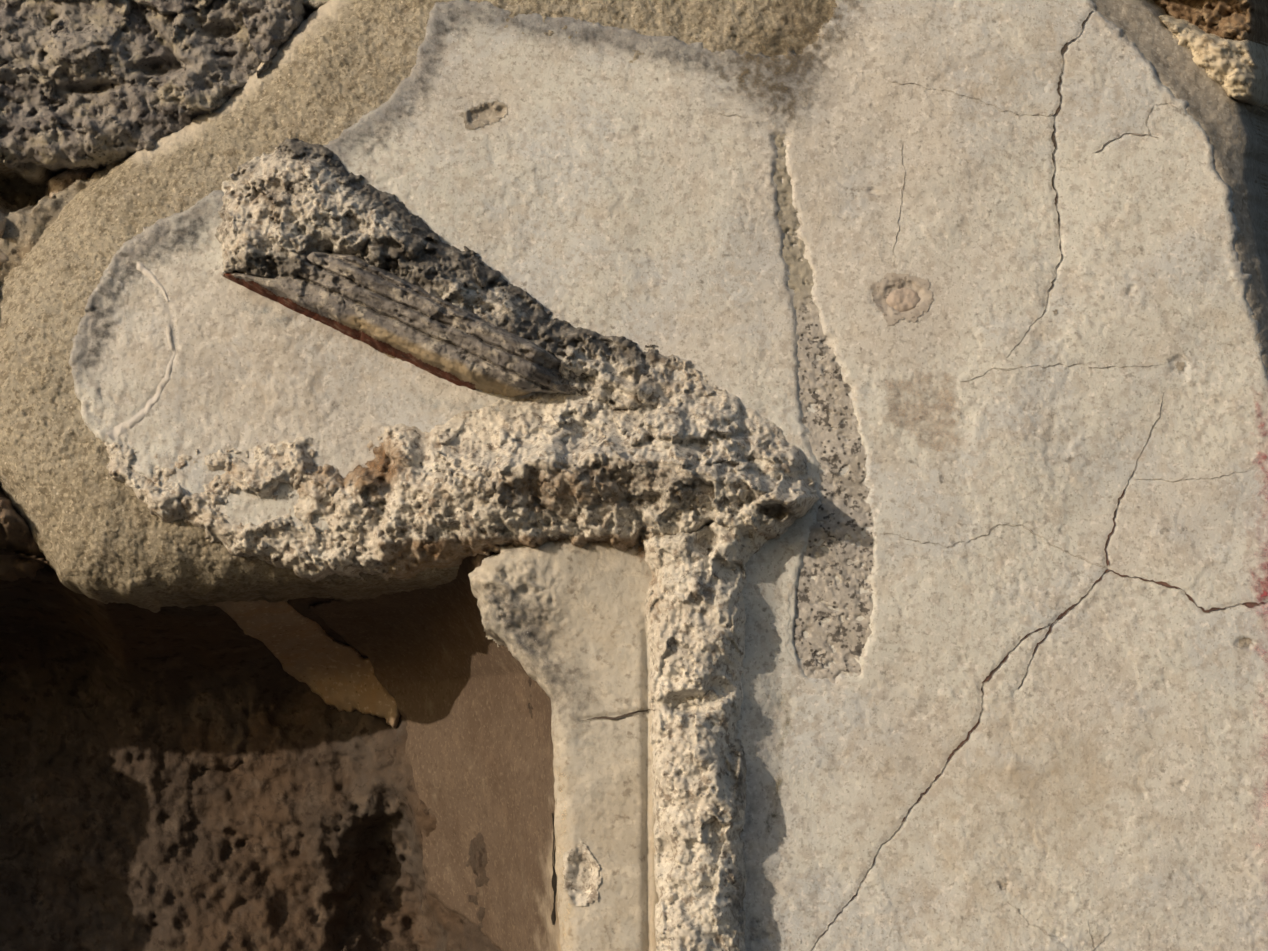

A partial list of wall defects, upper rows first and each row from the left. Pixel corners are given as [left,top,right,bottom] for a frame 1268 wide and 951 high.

crack [905,10,1152,382]
crack [1097,104,1191,152]
crack [810,403,1268,951]